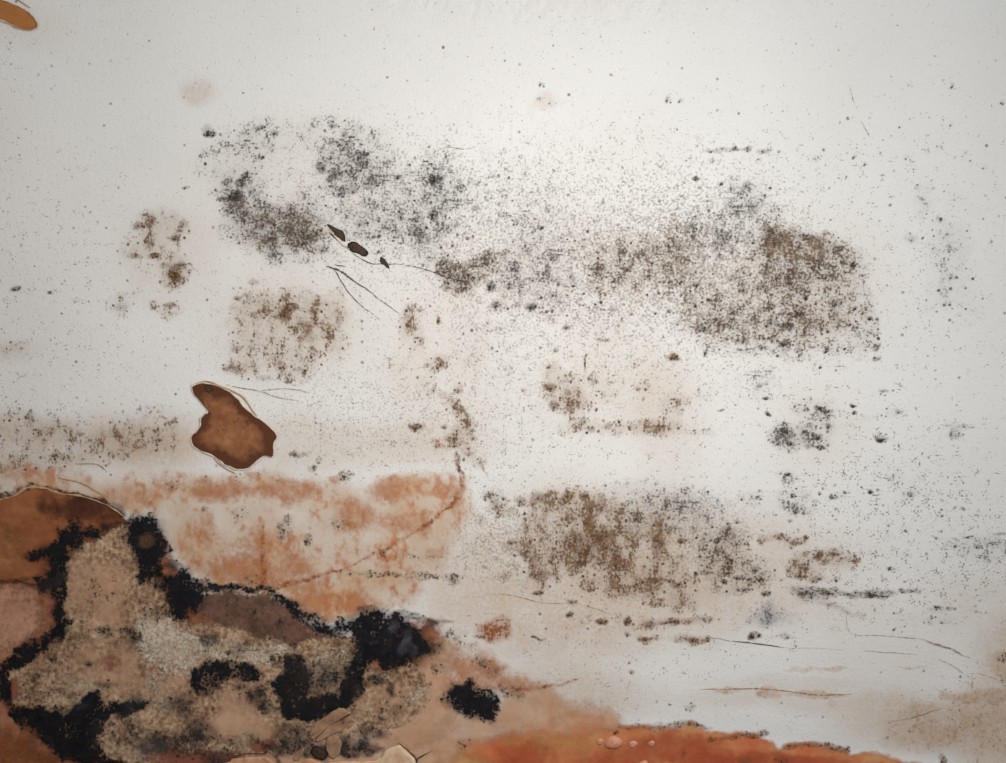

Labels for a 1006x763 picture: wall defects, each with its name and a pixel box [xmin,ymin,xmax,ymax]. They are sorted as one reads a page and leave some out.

peeling [0,0,38,30]
water stain [199,116,880,362]
water stain [222,284,349,384]
peeling [190,381,310,474]
water stain [543,354,689,436]
peeling [0,478,128,585]
corrosion [411,460,464,534]
peeling [293,708,418,763]